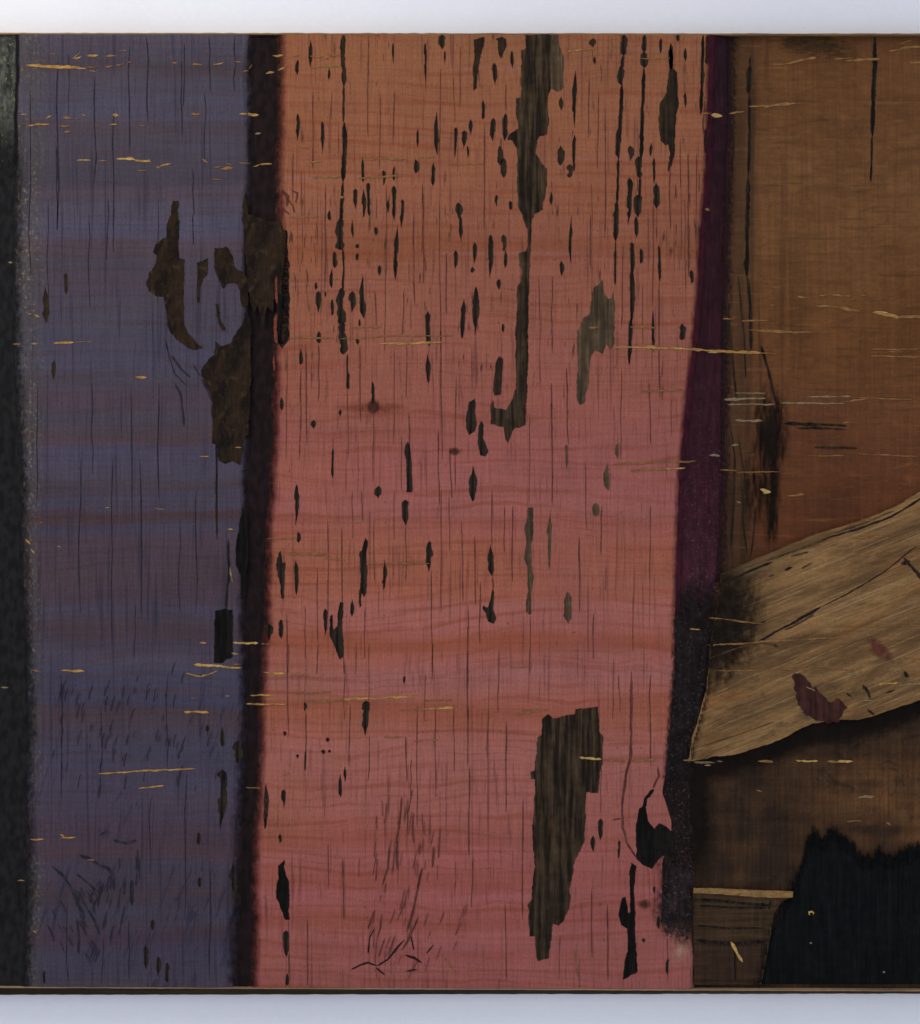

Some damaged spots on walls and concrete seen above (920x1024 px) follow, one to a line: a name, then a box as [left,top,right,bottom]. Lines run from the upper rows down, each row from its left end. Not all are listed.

peeling [424,35,446,81]
peeling [414,112,440,185]
peeling [454,34,577,456]
peeling [627,35,687,364]
peeling [146,197,290,465]
peeling [577,280,615,405]
peeling [214,609,233,663]
peeling [323,538,368,659]
peeling [276,860,290,956]
peeling [527,707,603,961]
peeling [618,789,674,980]